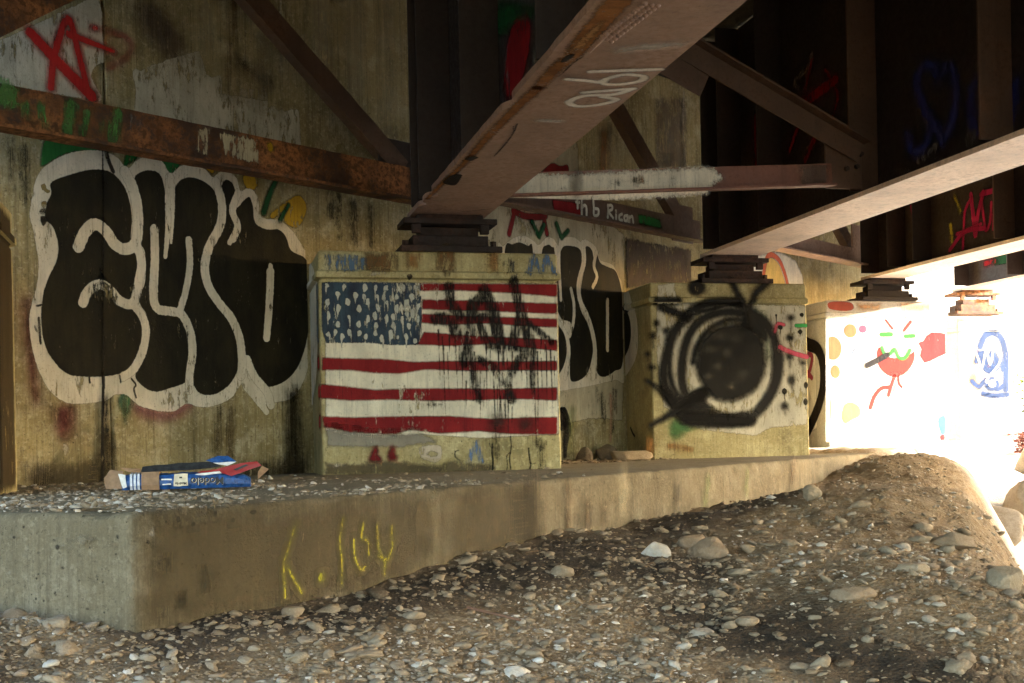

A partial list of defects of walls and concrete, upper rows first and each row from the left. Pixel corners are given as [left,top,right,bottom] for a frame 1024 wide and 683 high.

corrosion [425,0,633,199]
water stain [32,398,116,486]
water stain [242,385,305,476]